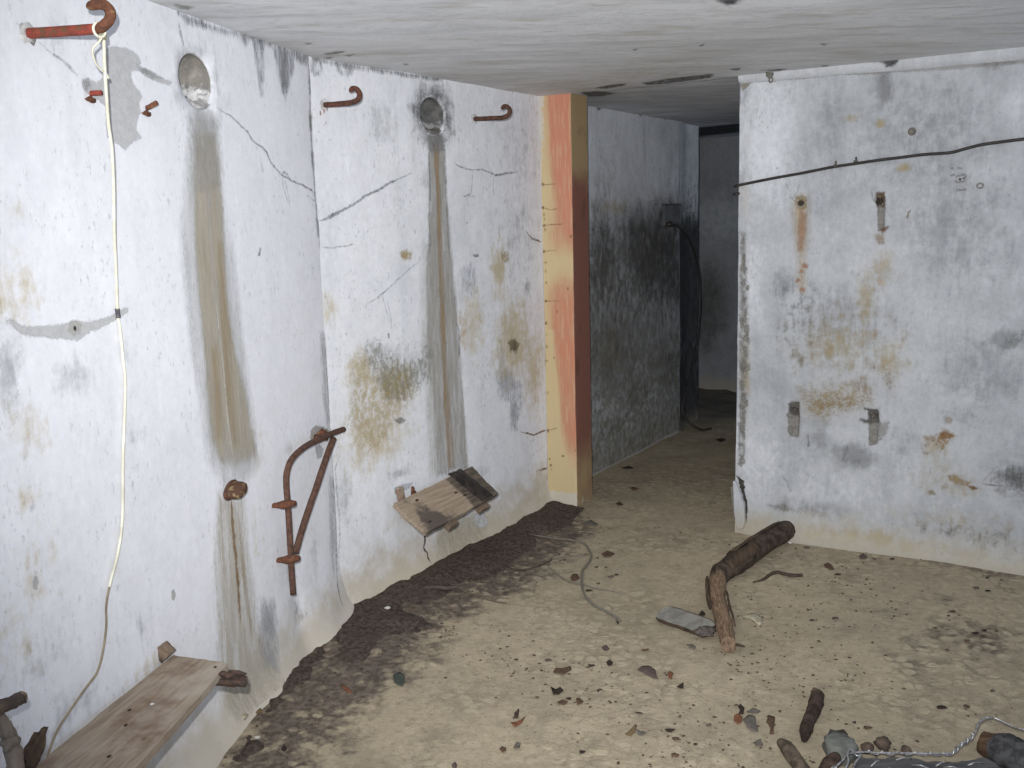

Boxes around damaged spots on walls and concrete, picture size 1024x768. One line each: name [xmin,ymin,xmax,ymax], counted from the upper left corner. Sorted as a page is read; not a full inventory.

crack [219,70,395,248]
rust [795,196,807,291]
damp [184,121,255,479]
crack [321,339,329,422]
damp [350,136,467,474]
damp [589,197,698,472]
flaking render [786,402,800,437]
flaking render [860,408,887,445]
rust [925,418,954,449]
crack [331,464,340,556]
peeling [731,480,746,530]
rust [219,500,276,708]